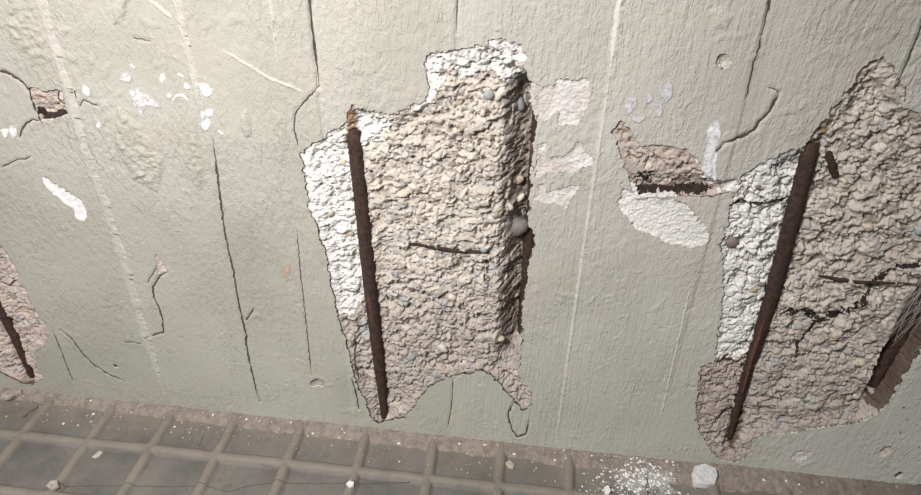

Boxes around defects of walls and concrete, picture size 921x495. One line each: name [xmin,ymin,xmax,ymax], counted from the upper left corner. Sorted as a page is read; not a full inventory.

spalling [29,85,90,122]
crack [293,0,320,145]
corrosion [345,109,357,144]
crack [715,0,779,152]
crack [895,26,921,89]
spalling [0,244,51,401]
crack [213,142,260,402]
crack [297,234,312,375]
spalling [300,38,593,422]
spalling [611,57,921,462]
corrosion [728,407,744,448]